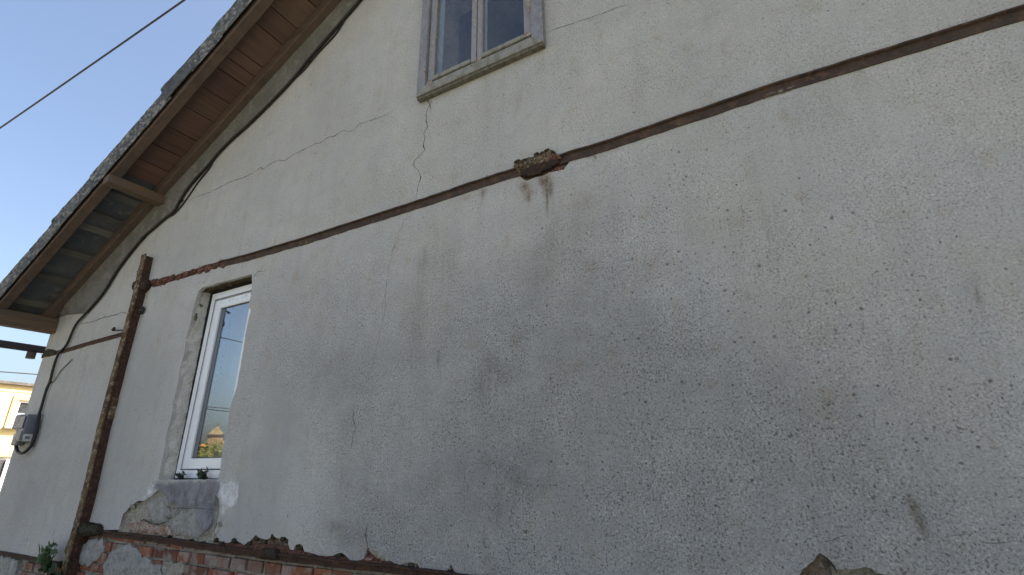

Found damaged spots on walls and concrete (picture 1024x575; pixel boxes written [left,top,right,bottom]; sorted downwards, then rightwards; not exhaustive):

crack [414,100,432,196]
flaking render [513,148,567,181]
flaking render [118,490,222,543]
flaking render [241,534,304,550]